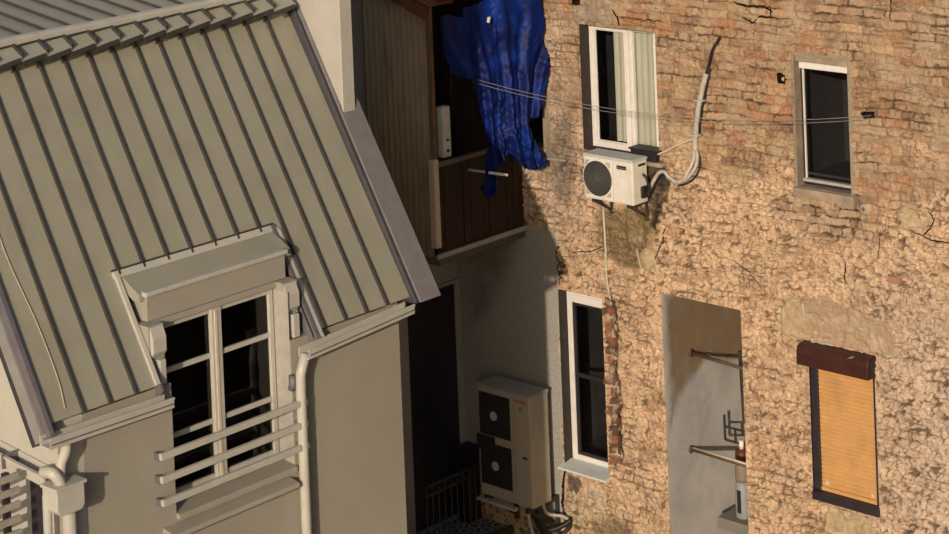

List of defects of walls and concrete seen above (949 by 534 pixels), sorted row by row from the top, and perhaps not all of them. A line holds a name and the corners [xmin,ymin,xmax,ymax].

leakage [599,161,670,268]
crack [914,212,949,244]
flaking render [601,297,623,465]